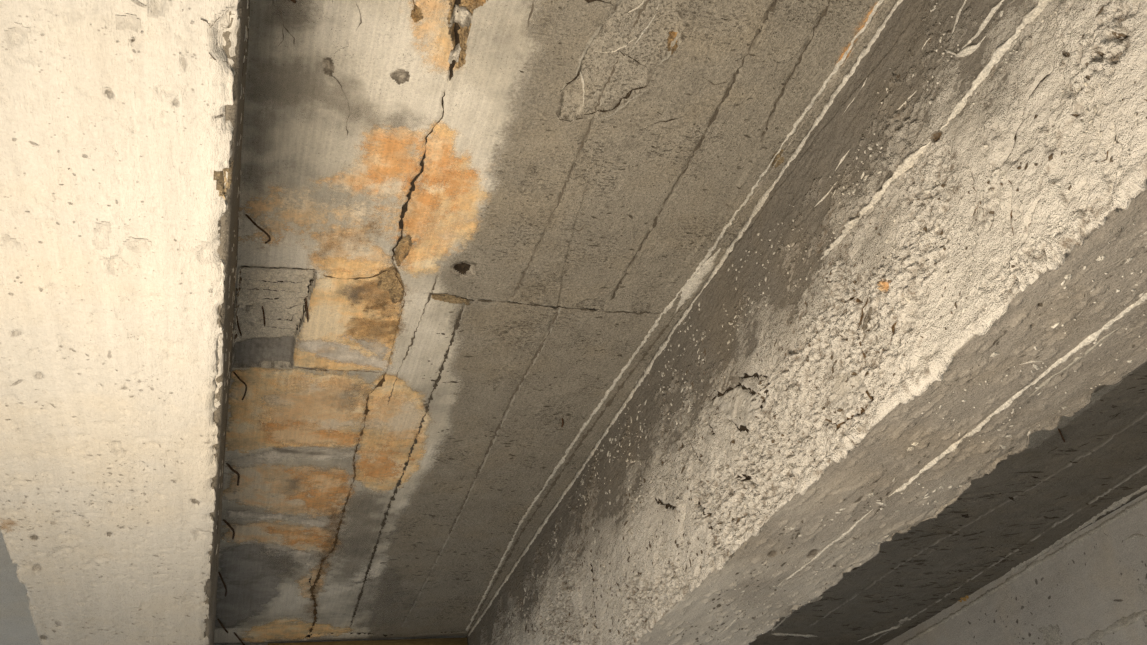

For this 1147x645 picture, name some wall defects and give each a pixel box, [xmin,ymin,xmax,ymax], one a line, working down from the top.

spalling [212,266,317,407]
corrosion [221,124,487,643]
damp [214,0,541,643]
spalling [390,69,410,85]
spalling [447,0,488,69]
crack [309,0,777,634]
crack [760,0,830,138]
peeling [469,0,1147,645]